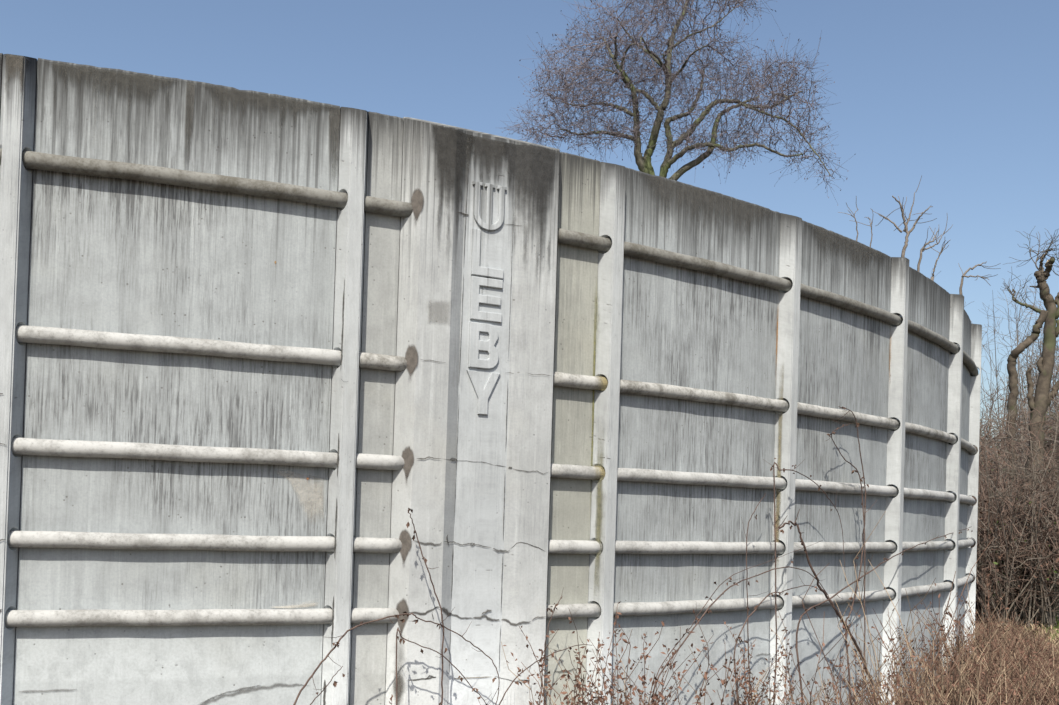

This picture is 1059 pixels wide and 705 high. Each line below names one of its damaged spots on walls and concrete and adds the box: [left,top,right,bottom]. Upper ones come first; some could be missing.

water stain [52,62,172,96]
water stain [186,82,195,139]
water stain [208,86,340,151]
water stain [433,125,557,232]
crack [421,158,469,375]
crack [506,207,550,440]
crack [409,407,548,682]
crack [201,680,326,705]